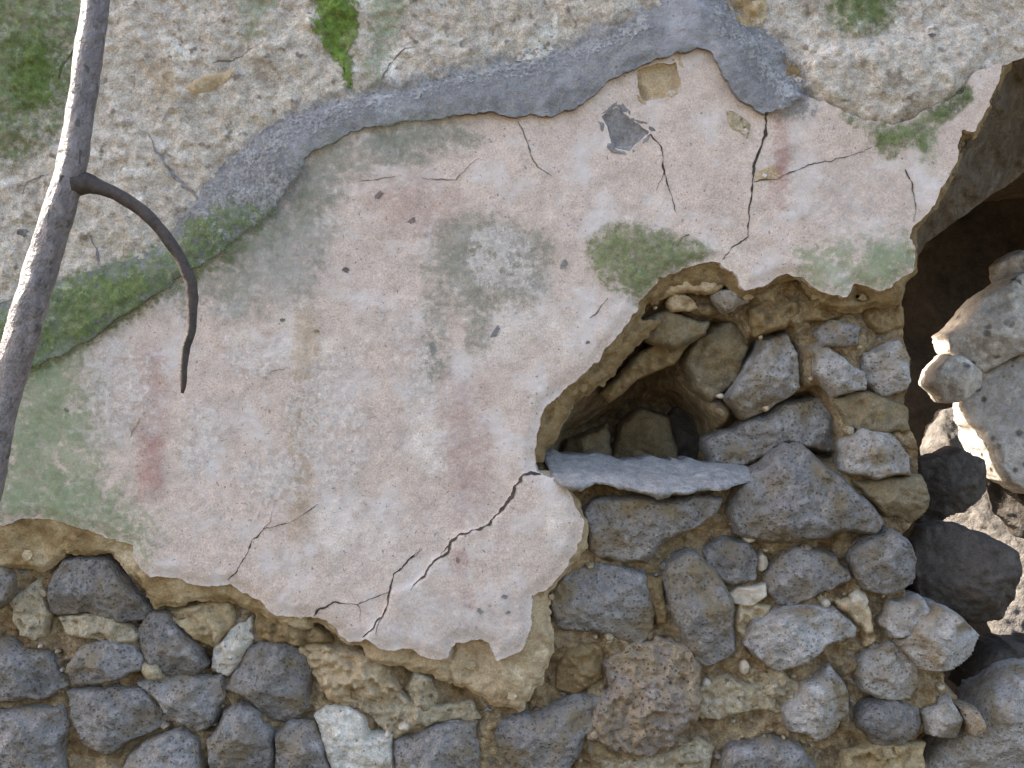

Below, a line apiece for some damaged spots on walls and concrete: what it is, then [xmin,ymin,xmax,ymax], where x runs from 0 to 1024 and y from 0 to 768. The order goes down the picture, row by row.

peeling [187,68,237,94]
peeling [517,12,559,62]
spalling [725,0,768,28]
water stain [197,116,467,318]
crack [518,122,551,176]
crack [650,134,689,247]
spalling [535,53,1013,476]
crack [723,112,871,259]
crack [228,505,316,580]
spalling [0,491,589,712]
crack [314,471,541,638]